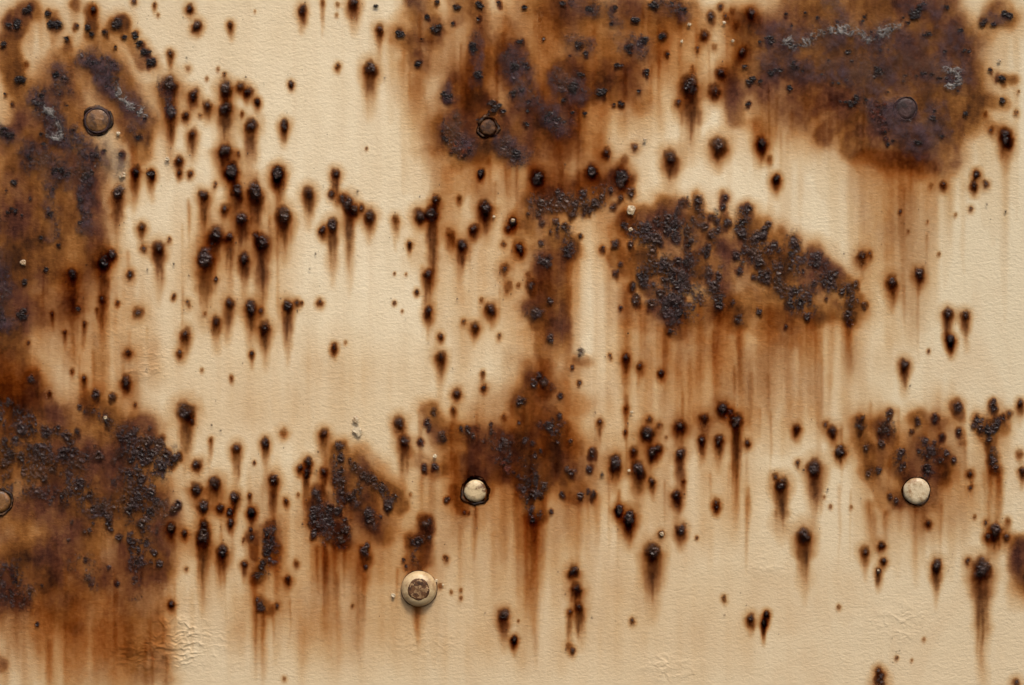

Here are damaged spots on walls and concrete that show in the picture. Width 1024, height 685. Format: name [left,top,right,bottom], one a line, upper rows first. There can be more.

corrosion [674,0,1020,192]
corrosion [302,167,376,254]
corrosion [0,0,304,678]
corrosion [375,0,882,573]
corrosion [268,427,449,573]
corrosion [644,523,699,595]
corrosion [823,397,1024,527]